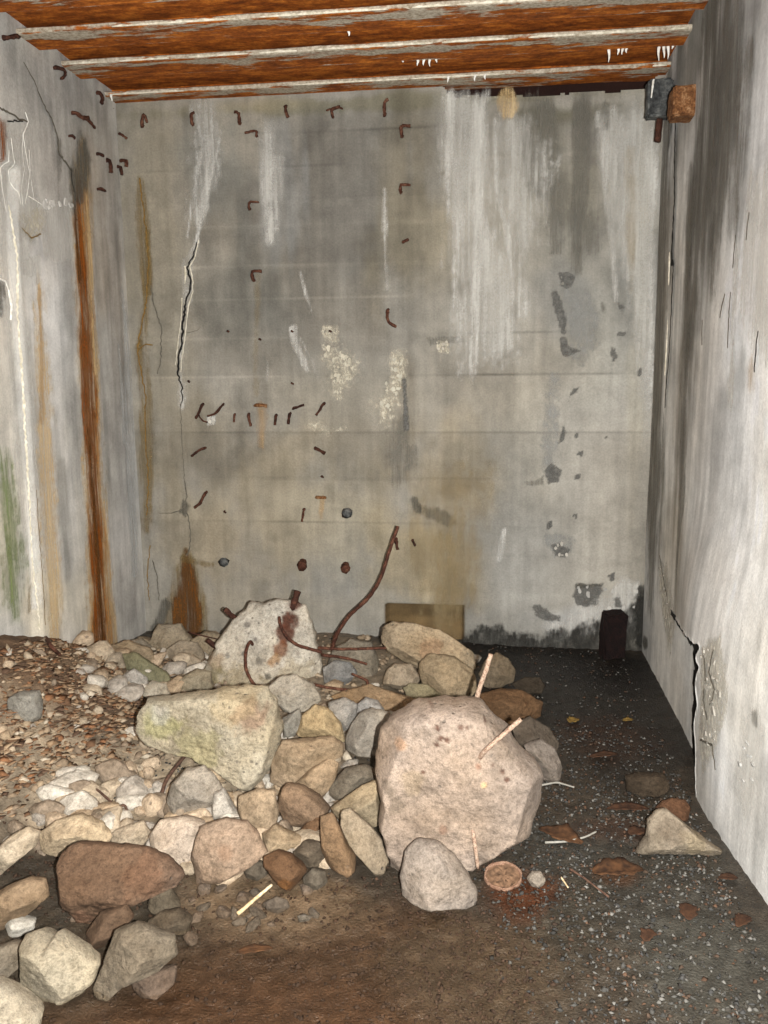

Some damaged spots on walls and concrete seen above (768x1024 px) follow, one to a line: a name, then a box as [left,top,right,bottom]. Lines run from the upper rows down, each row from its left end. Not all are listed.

damp [447,92,512,367]
corrosion [71,139,117,644]
crack [137,178,199,556]
spalling [531,378,578,485]
crack [147,545,160,600]
corrosion [152,551,205,633]
damp [462,609,601,649]
spalling [533,605,560,621]
spalling [546,521,569,556]
spalling [573,573,638,611]
damp [614,583,652,651]
crack [671,610,699,756]